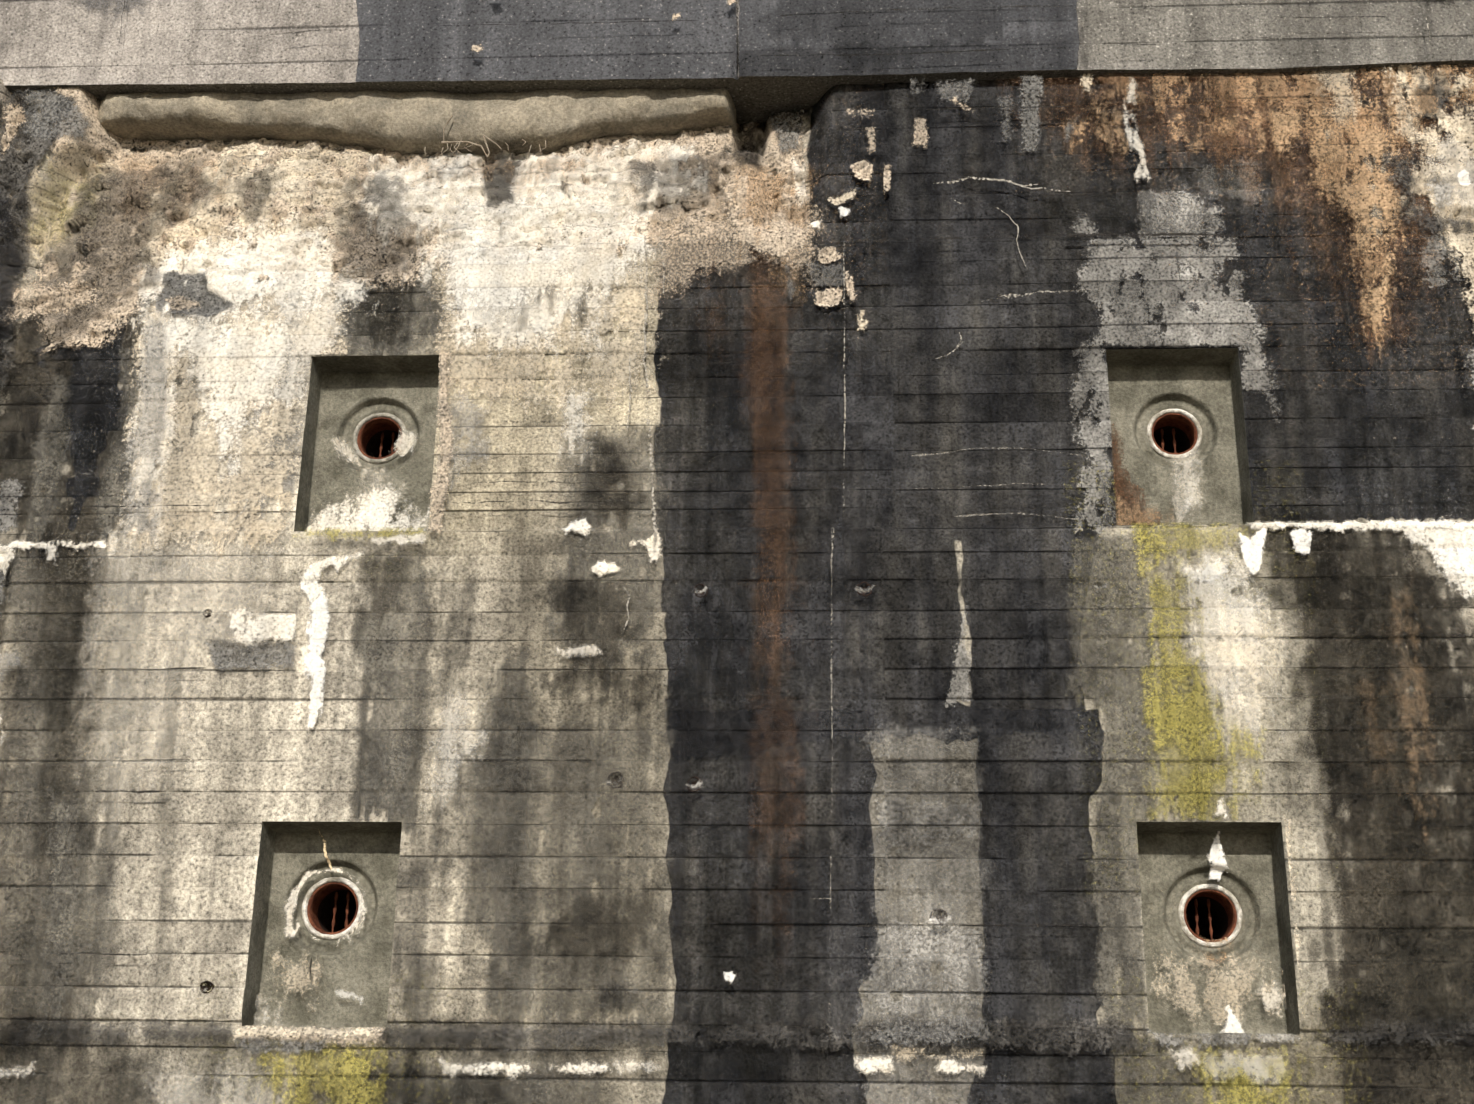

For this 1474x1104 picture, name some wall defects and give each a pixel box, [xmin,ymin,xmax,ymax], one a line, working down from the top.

spalling [0,87,868,387]
spalling [828,109,891,216]
spalling [913,119,928,146]
spalling [1001,75,1043,152]
rust [1074,66,1411,346]
rust [1439,64,1474,103]
spalling [309,350,453,544]
spalling [0,548,13,616]
leakage [354,0,1474,1104]
spalling [205,639,296,669]
leakage [0,250,645,1042]
leakage [149,1078,169,1104]